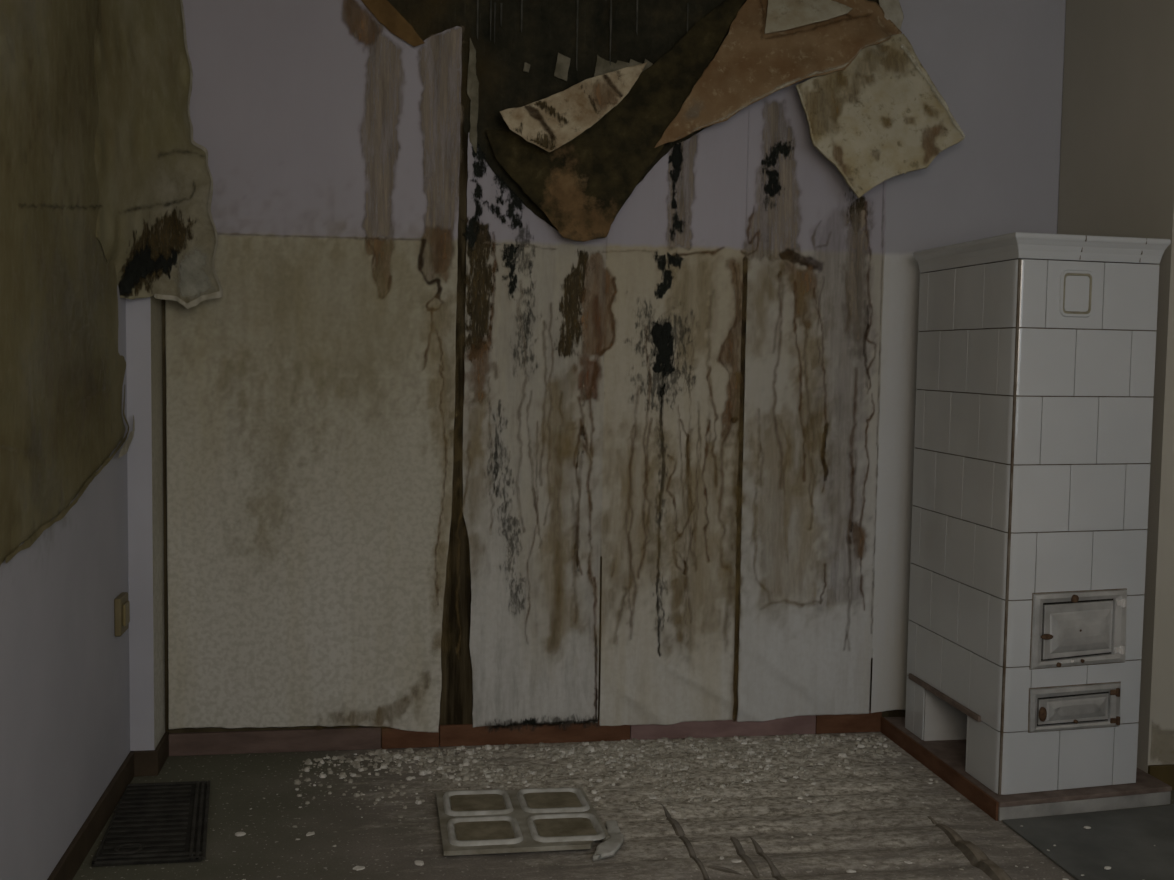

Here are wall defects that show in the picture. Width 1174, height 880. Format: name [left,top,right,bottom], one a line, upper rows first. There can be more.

flaking render [0,0,135,566]
spalling [388,0,726,231]
damp [627,135,721,656]
damp [743,101,823,333]
damp [845,193,872,343]